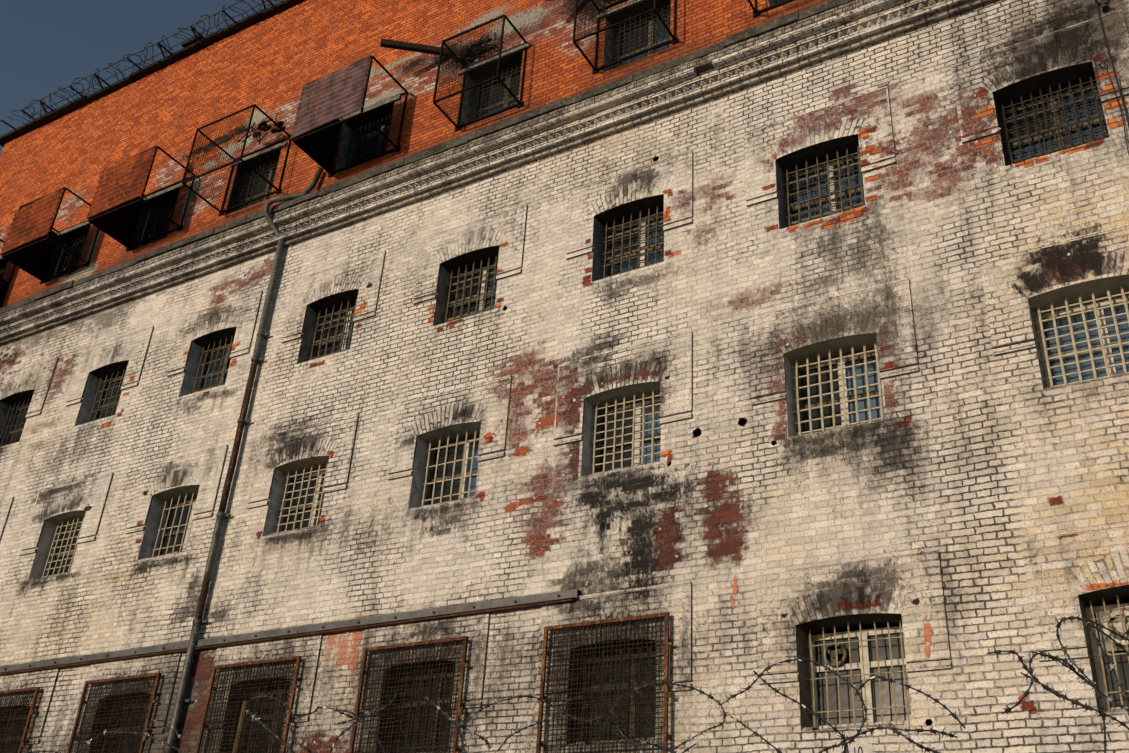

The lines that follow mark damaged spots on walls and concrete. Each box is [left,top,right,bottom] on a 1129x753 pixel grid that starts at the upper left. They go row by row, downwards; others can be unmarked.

peeling [762,53,1128,233]
peeling [207,258,274,318]
peeling [879,327,901,409]
peeling [771,363,787,442]
peeling [483,342,670,558]
leakage [784,416,916,472]
spalling [1047,496,1064,506]
peeling [652,507,684,570]
peeling [693,463,755,608]
leakage [547,551,655,614]
spalling [1085,582,1129,593]
peeling [924,616,932,657]